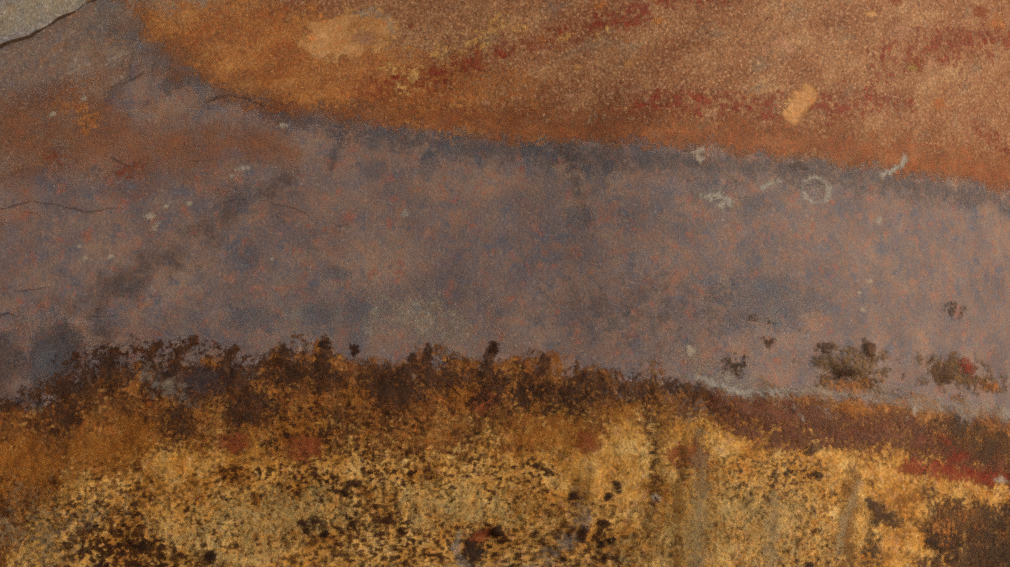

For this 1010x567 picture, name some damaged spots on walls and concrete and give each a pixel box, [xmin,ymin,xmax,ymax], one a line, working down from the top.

crack [0,0,96,49]
rust [0,334,1010,567]